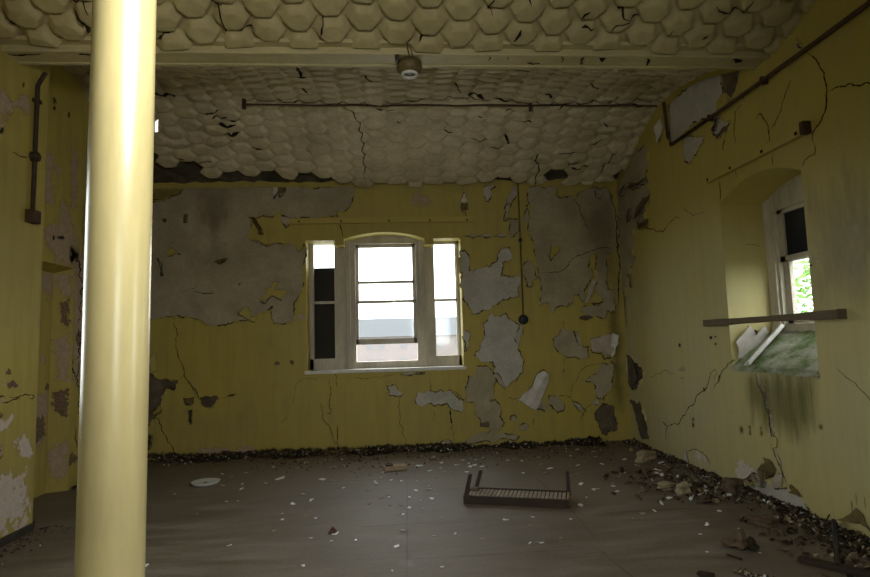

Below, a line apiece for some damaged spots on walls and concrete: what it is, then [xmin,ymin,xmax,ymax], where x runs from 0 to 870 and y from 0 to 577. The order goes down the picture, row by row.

crack [73,0,90,75]
crack [211,0,254,32]
crack [488,30,540,71]
crack [581,2,642,33]
crack [205,68,661,187]
crack [802,53,870,167]
peeling [150,186,357,327]
spalling [0,148,84,536]
peeling [148,351,179,449]
peeling [183,394,235,424]
crack [650,360,733,437]
crack [755,373,787,484]